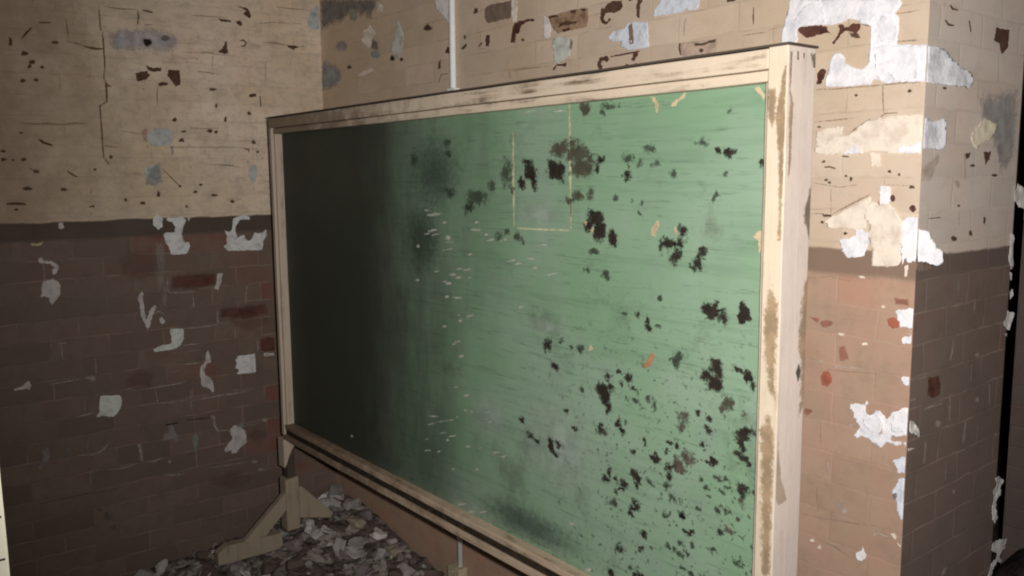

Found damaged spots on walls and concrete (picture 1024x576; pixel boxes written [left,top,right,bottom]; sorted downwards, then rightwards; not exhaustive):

peeling [438,0,700,70]
peeling [781,0,974,96]
crack [85,11,111,164]
peeling [814,113,947,188]
water stain [983,94,1015,167]
peeling [153,205,190,255]
peeling [224,214,267,251]
peeling [821,186,944,277]
peeling [31,242,61,304]
peeling [76,286,267,471]
peeling [849,398,926,521]
peeling [992,476,1004,524]